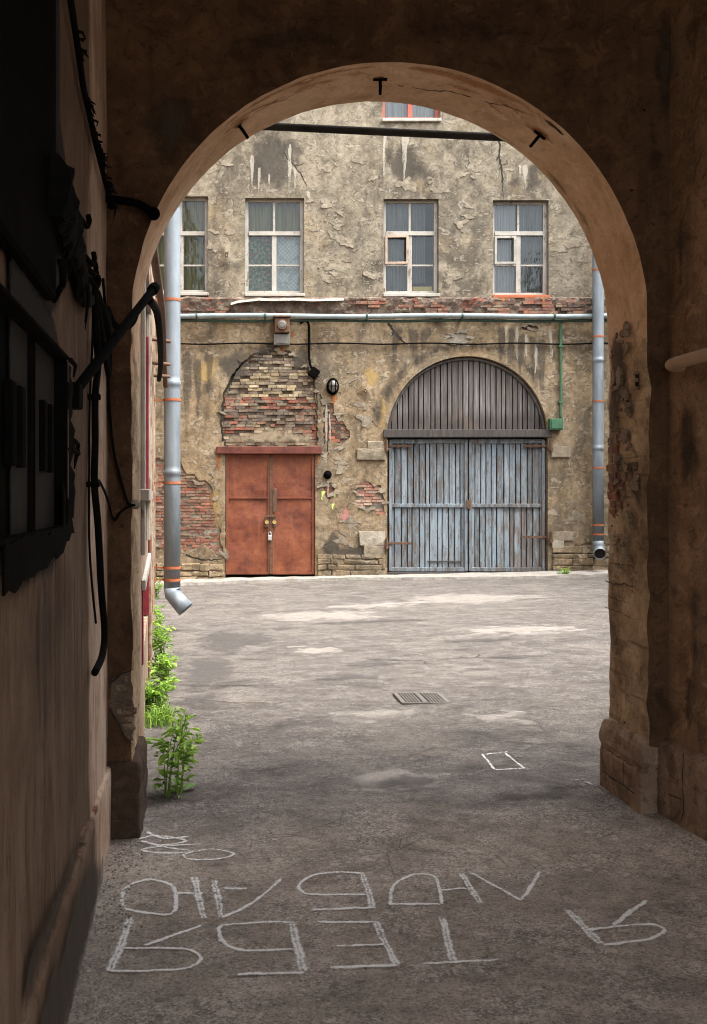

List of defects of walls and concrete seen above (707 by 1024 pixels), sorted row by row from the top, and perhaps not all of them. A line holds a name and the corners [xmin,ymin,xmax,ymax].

crack [398,85,537,118]
water stain [251,138,300,186]
peeling [395,176,449,193]
crack [496,141,508,196]
peeling [302,185,376,285]
peeling [454,202,479,232]
peeling [349,268,469,313]
flaking render [218,348,372,500]
spalling [155,457,164,556]
spalling [180,461,229,560]
spalling [333,482,390,548]